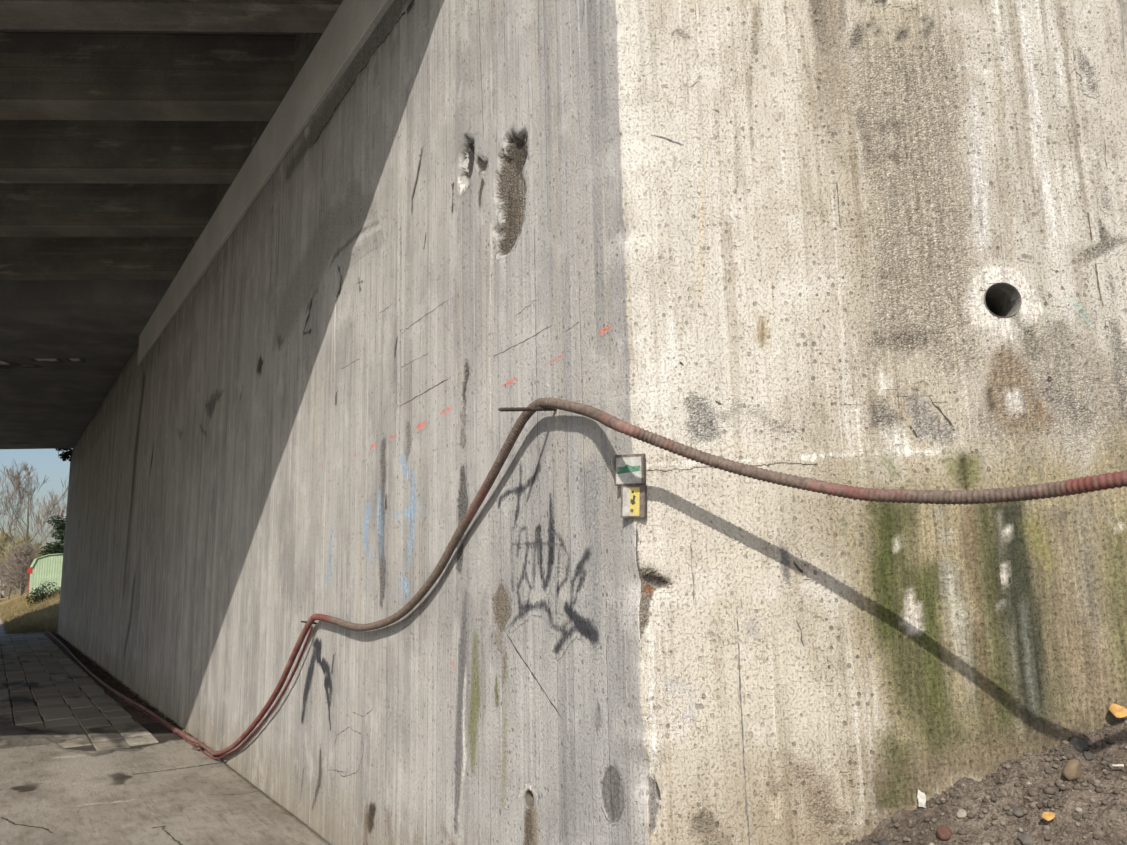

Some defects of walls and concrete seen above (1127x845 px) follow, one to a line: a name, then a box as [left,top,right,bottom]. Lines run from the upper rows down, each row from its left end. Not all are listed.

spalling [450,125,530,261]
crack [478,0,505,137]
damp [646,0,1127,845]
peeling [635,520,712,841]